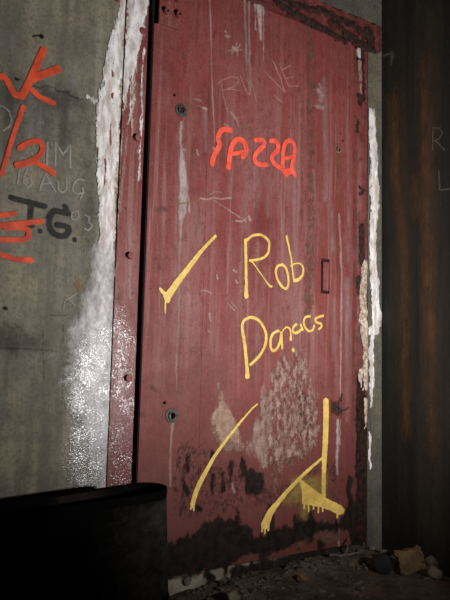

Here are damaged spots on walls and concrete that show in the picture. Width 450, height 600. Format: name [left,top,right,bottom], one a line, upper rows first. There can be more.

damp [69,0,134,490]
rust [274,0,377,324]
spalling [173,439,247,519]
peeling [209,346,321,477]
rust [204,374,367,584]